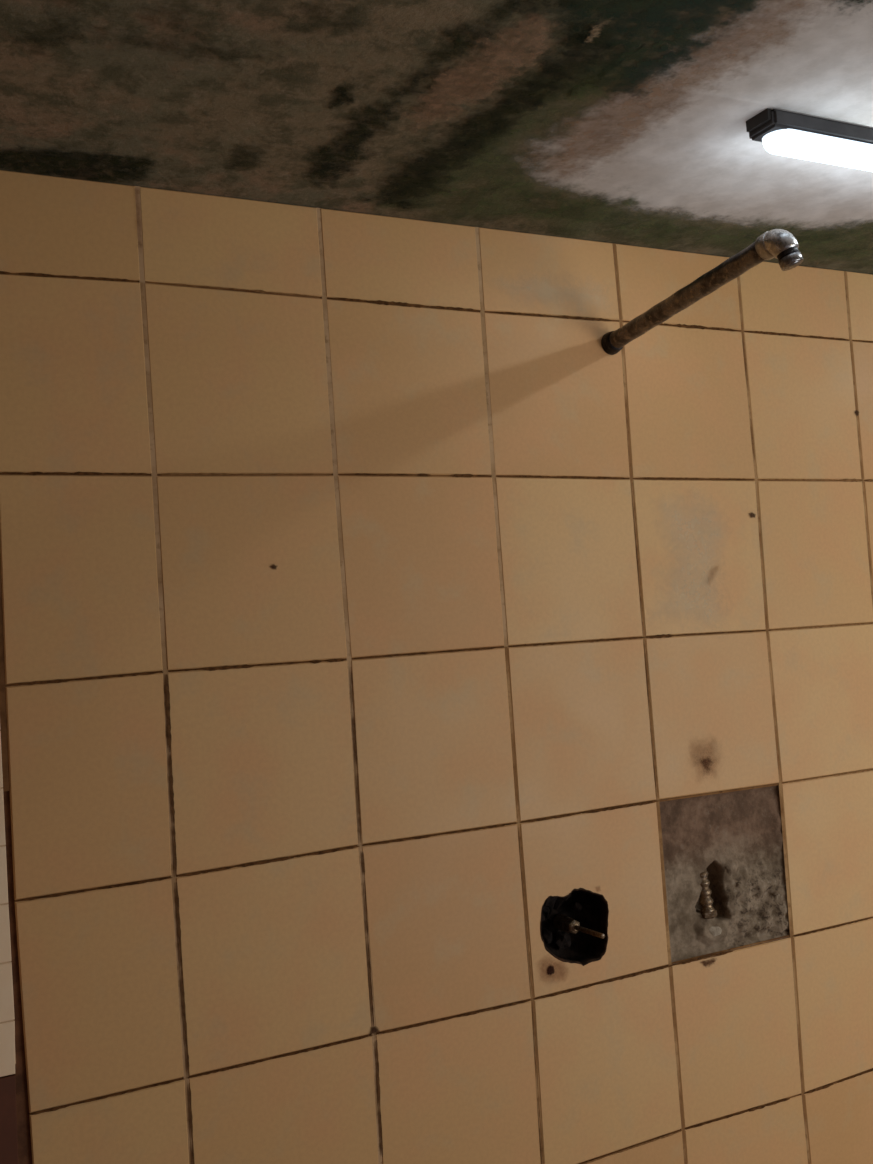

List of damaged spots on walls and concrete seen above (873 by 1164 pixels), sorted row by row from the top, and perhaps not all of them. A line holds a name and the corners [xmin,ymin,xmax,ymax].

damp [0,148,154,182]
damp [309,0,803,209]
spalling [540,888,609,966]
peeling [659,784,790,964]